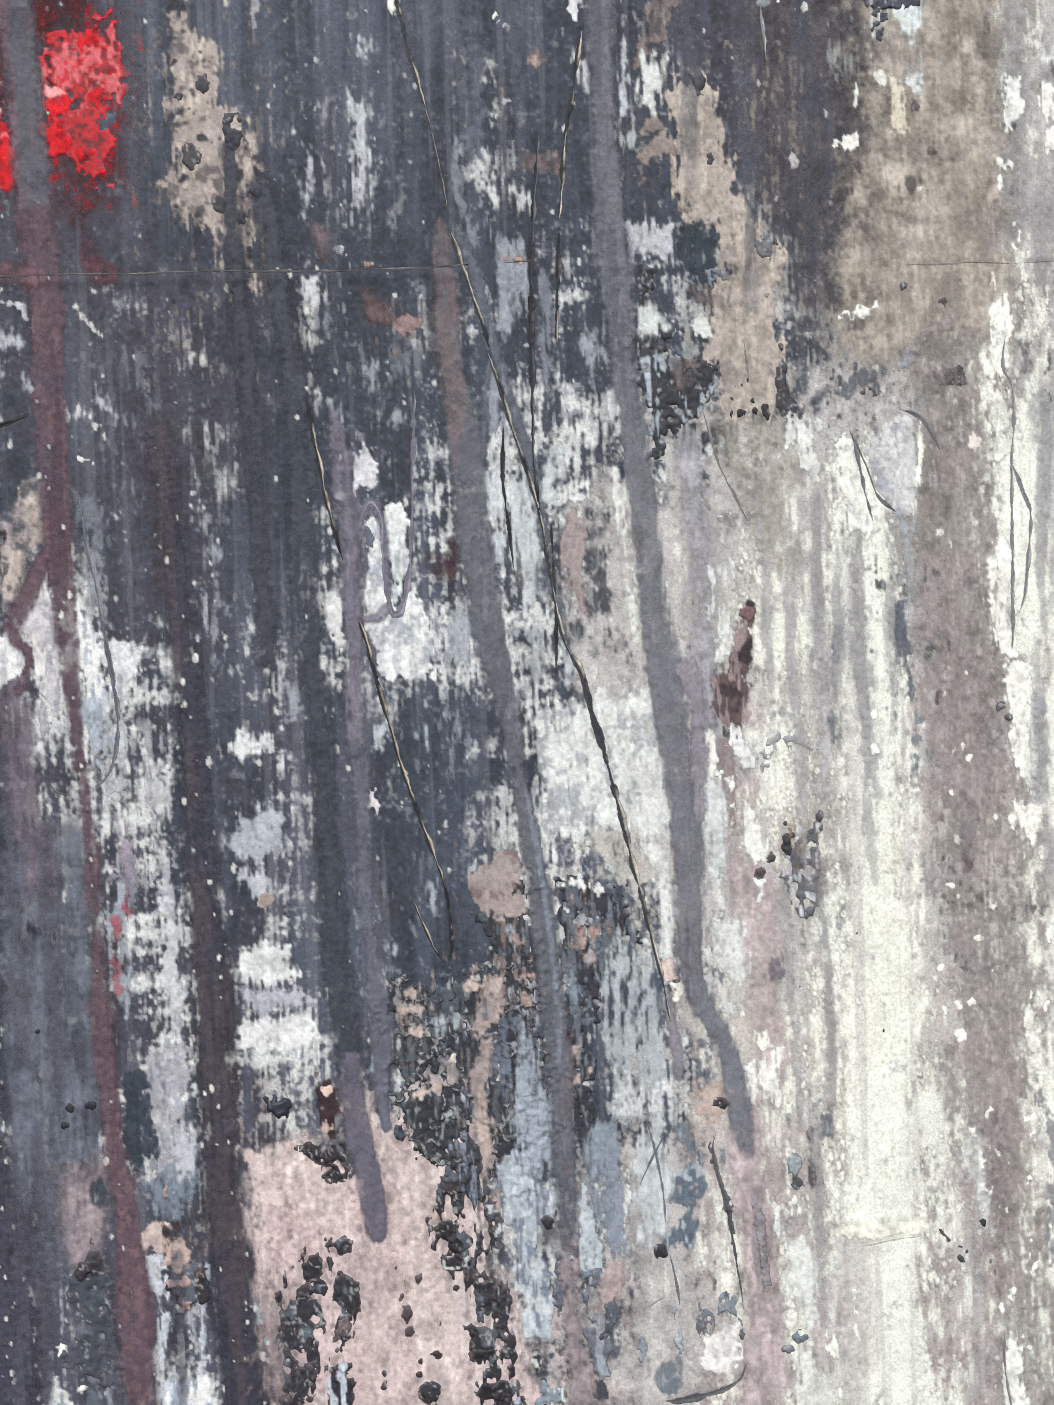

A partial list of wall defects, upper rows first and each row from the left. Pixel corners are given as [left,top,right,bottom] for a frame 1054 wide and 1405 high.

crack [0,263,467,278]
peeling [319,594,346,662]
peeling [333,440,379,502]
peeling [362,502,474,682]
peeling [450,136,560,397]
peeling [483,440,564,608]
peeling [617,0,940,774]
peeling [829,0,1054,462]
peeling [220,802,285,908]
damp [904,307,1054,1405]
peeling [228,684,745,1405]
peeling [722,1113,860,1405]